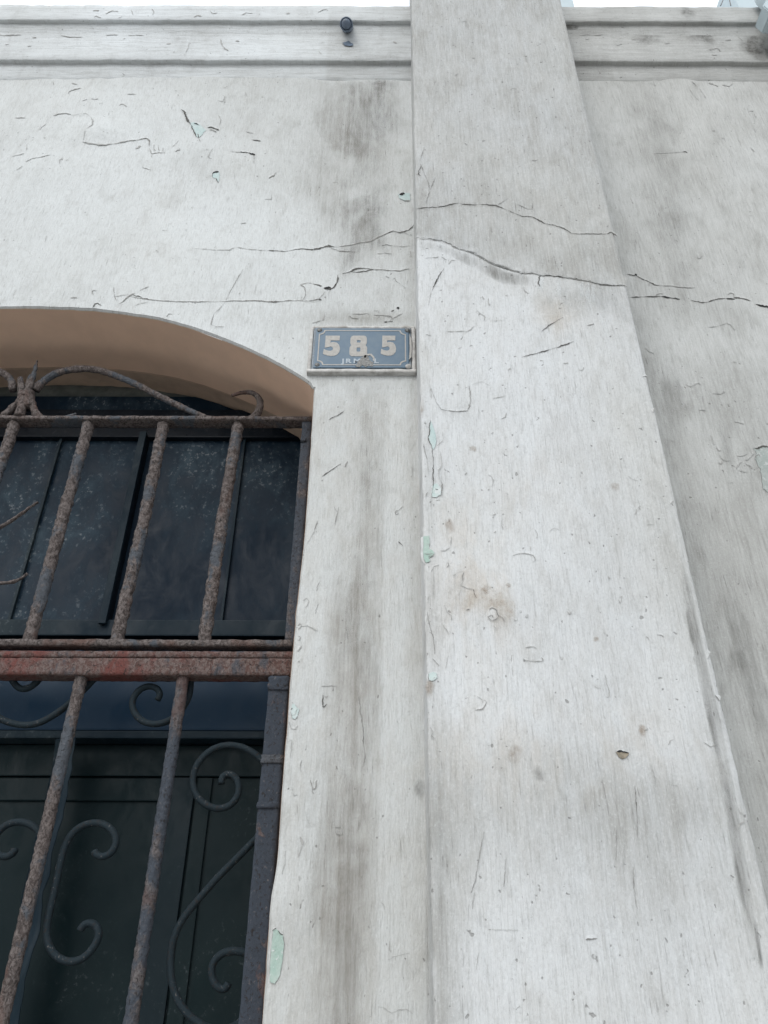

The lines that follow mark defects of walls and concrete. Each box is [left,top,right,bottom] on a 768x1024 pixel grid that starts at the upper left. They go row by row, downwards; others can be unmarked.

crack [71,199,618,329]
crack [628,274,768,307]
peeling [423,421,445,499]
peeling [421,535,452,564]
peeling [269,927,285,984]